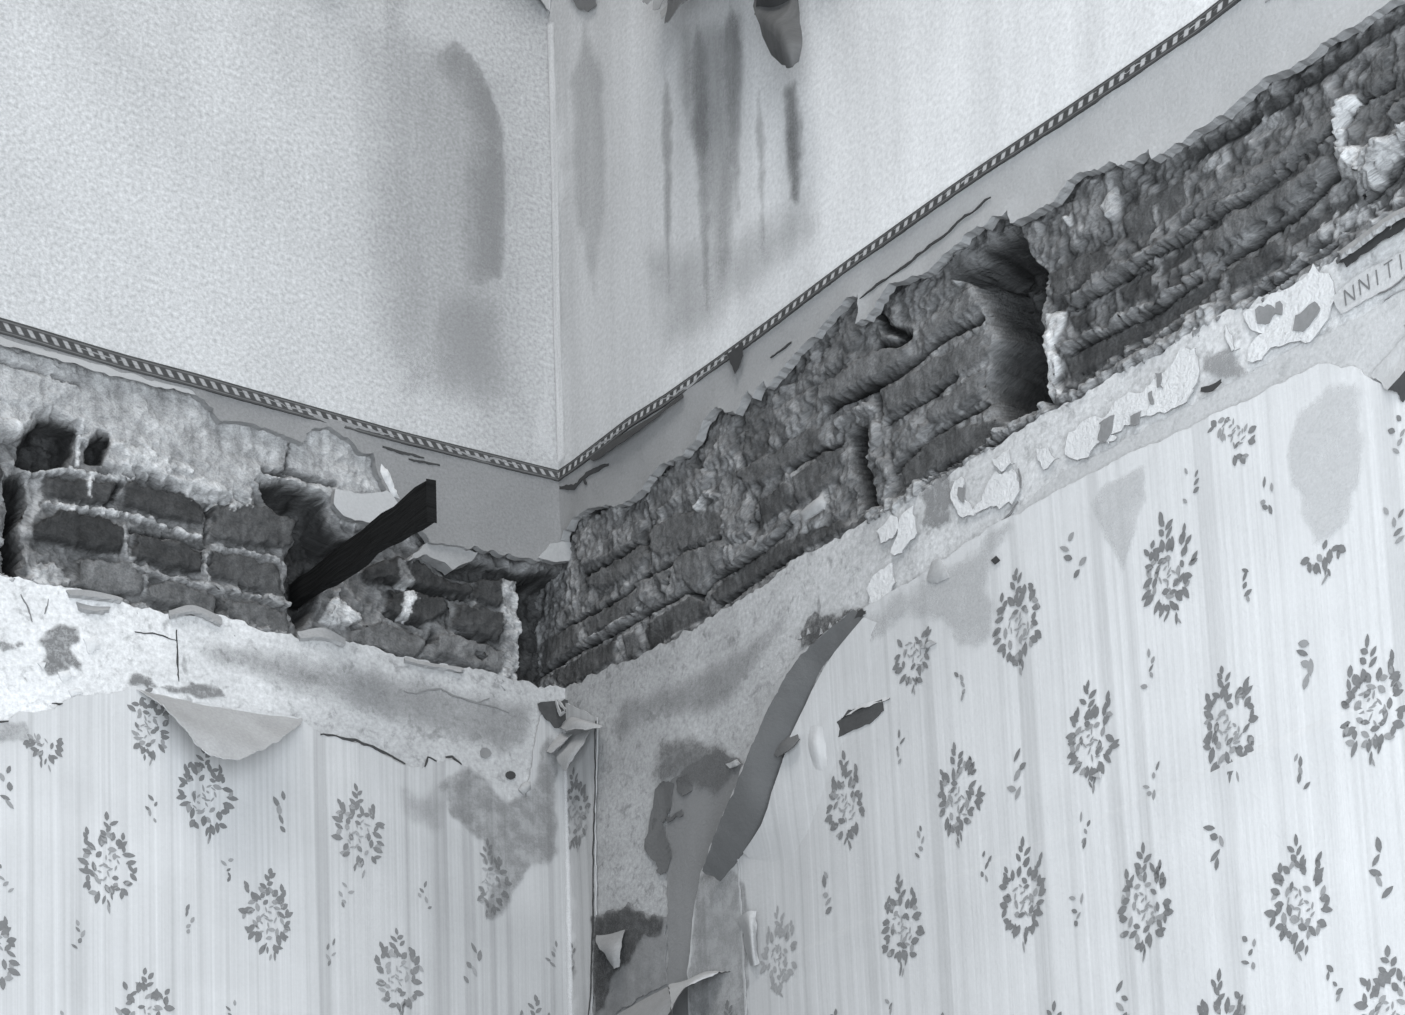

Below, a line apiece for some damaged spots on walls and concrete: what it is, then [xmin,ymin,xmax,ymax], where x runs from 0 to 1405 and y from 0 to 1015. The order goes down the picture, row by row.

peeling [573,0,597,12]
damp [787,101,797,191]
flaking render [0,4,1405,698]